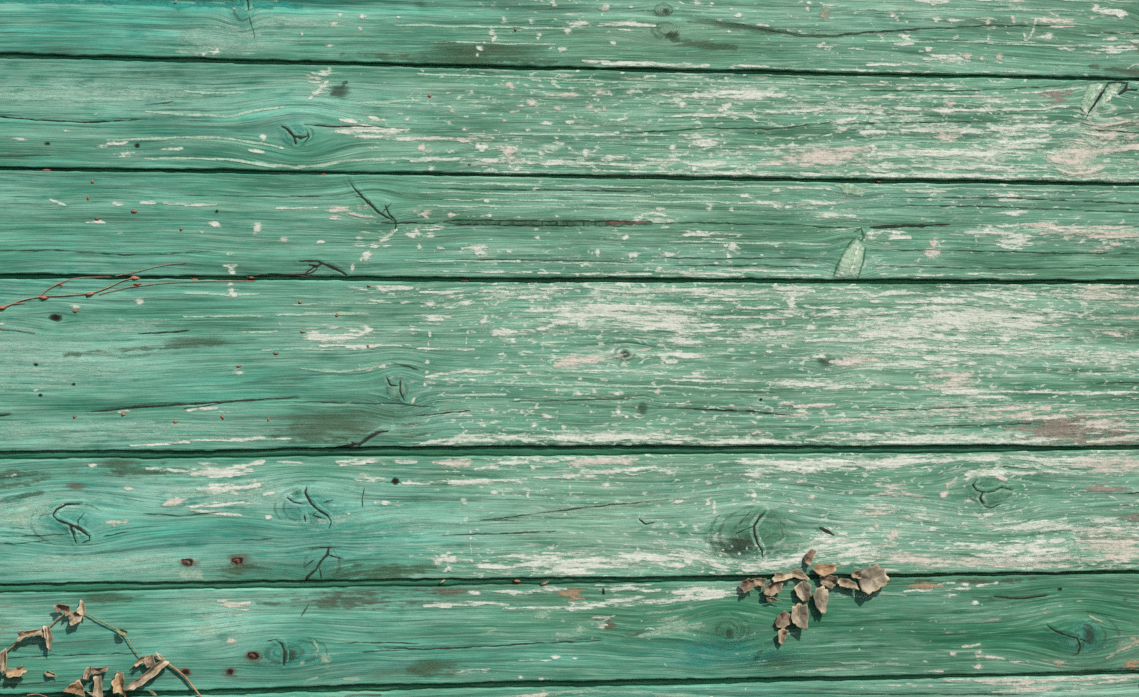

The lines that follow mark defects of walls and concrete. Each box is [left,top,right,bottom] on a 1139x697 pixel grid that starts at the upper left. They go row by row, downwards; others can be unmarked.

crack [348,179,1139,278]
peeling [100,0,1139,575]
crack [0,503,218,544]
peeling [20,554,202,578]
crack [287,487,343,616]
crack [737,511,766,556]
peeling [181,599,251,643]
peeling [423,584,747,637]
peeling [846,582,998,605]
crack [268,639,286,664]
peeling [797,662,869,673]
peeling [928,631,1139,693]